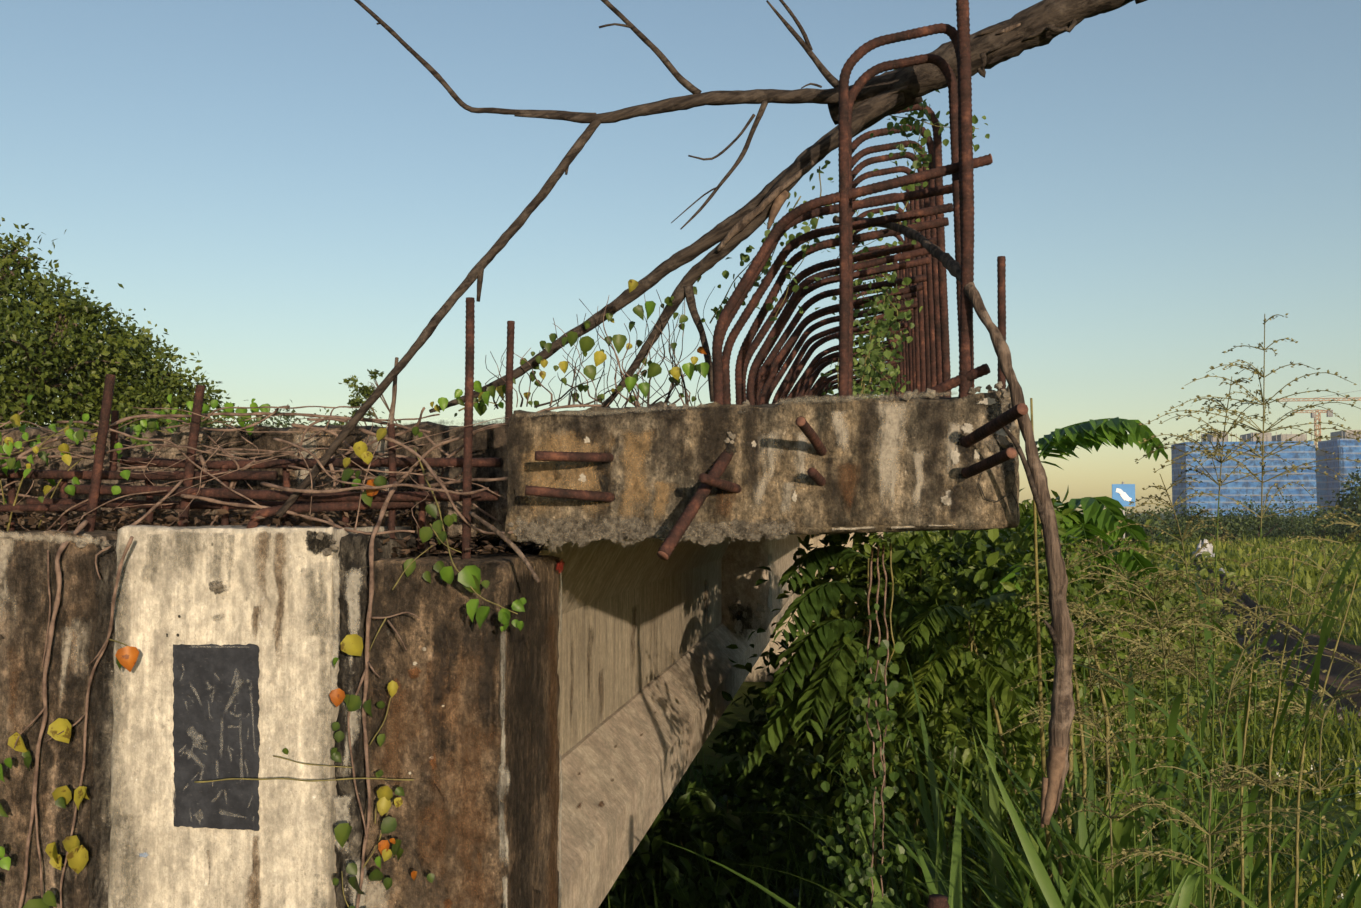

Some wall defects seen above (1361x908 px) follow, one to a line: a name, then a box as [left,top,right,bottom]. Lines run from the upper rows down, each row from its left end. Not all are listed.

leakage [206,421,445,512]
leakage [471,405,807,520]
spalling [508,462,795,550]
leakage [827,400,976,519]
leakage [0,538,138,908]
leakage [307,558,604,908]